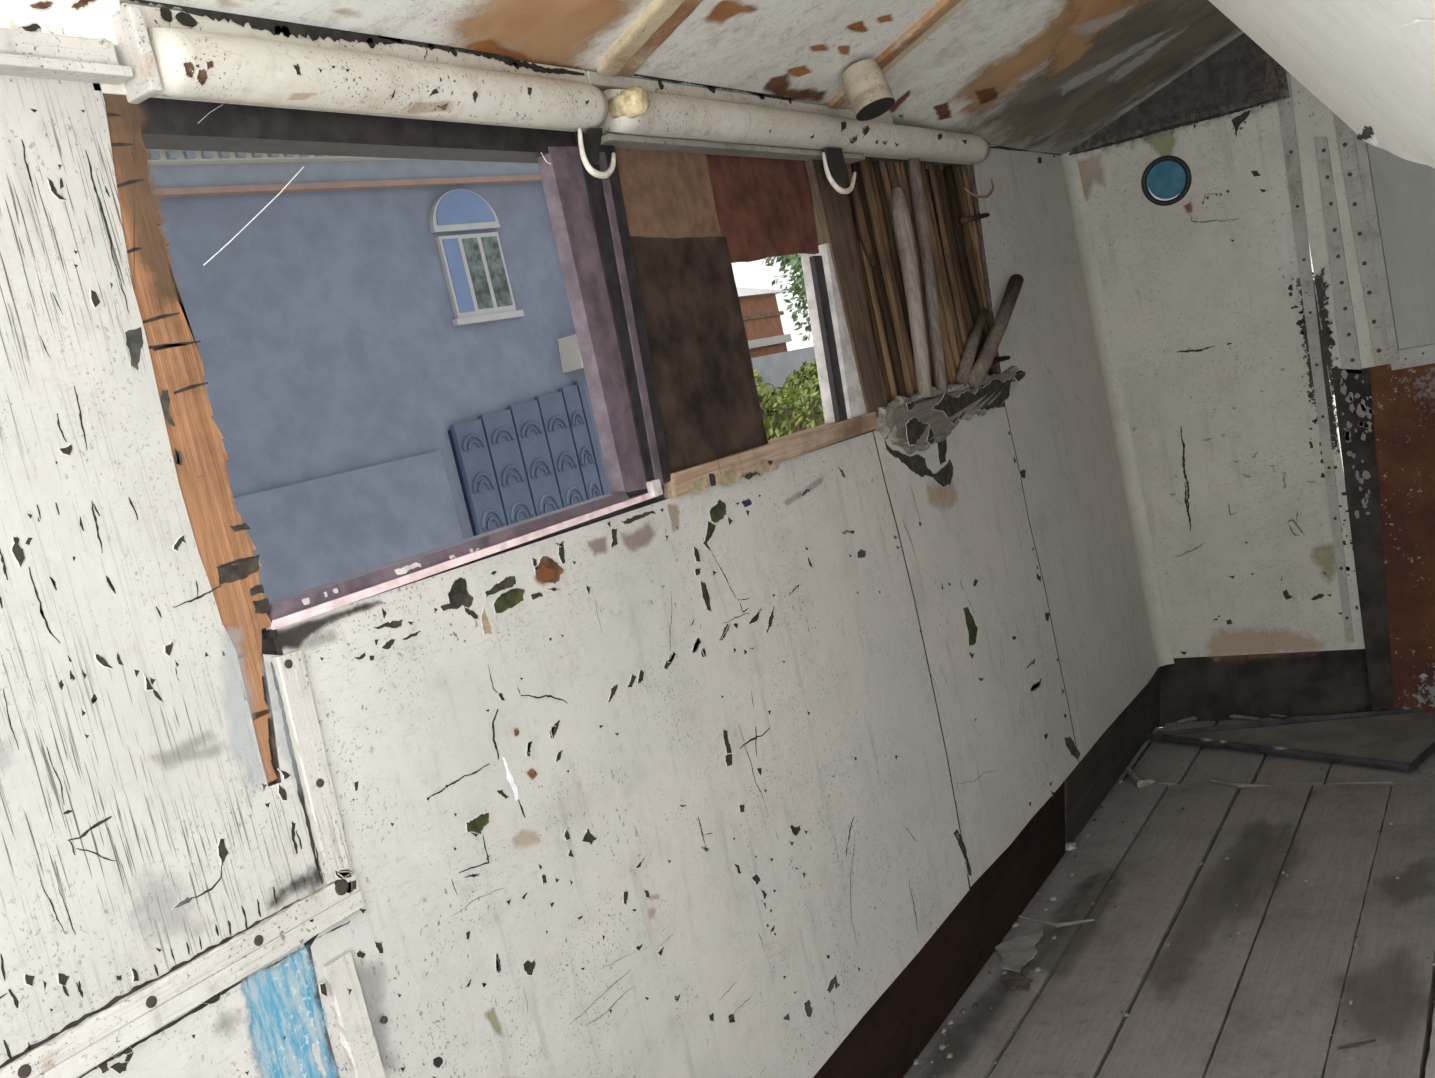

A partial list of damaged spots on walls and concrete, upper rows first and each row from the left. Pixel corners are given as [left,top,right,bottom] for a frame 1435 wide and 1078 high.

peeling [182,59,214,86]
peeling [46,164,67,201]
peeling [125,327,143,370]
peeling [883,370,1025,488]
peeling [10,536,33,569]
peeling [663,459,799,670]
peeling [963,606,978,659]
peeling [59,652,163,701]
peeling [455,812,489,837]
peeling [563,827,597,858]
peeling [522,958,536,976]
peeling [97,1046,134,1075]